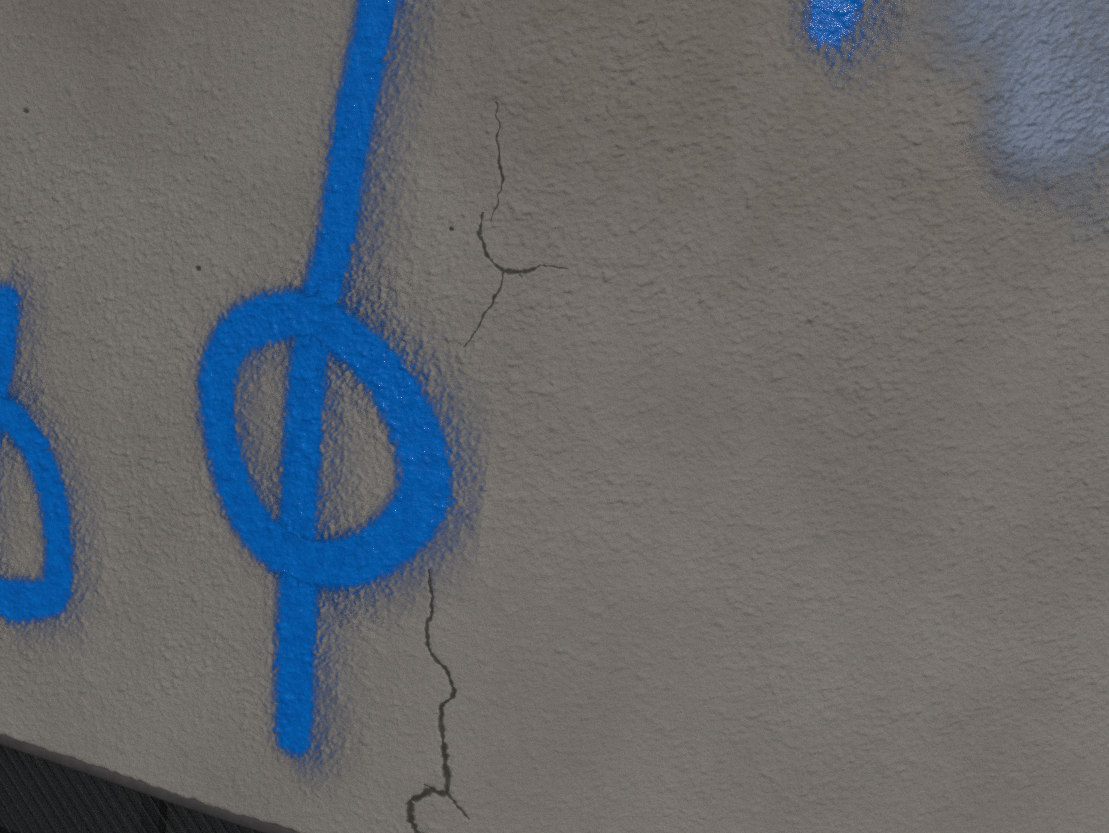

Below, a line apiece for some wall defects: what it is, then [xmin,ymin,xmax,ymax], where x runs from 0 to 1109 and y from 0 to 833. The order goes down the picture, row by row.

crack [464,101,568,347]
crack [407,569,470,833]